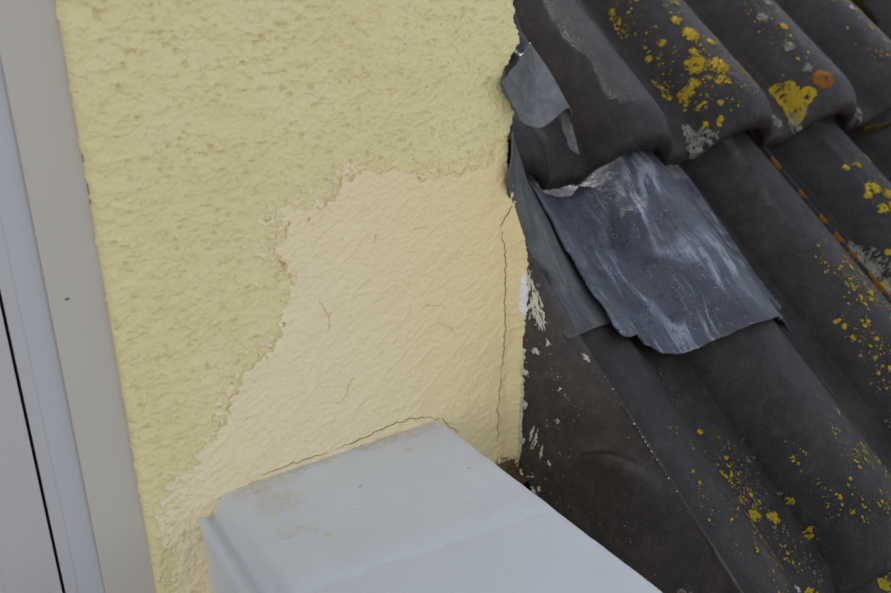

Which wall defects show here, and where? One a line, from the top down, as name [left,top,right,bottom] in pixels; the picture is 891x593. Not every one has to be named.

crack [497,207,512,440]
crack [264,416,457,475]
flaking render [496,349,526,464]